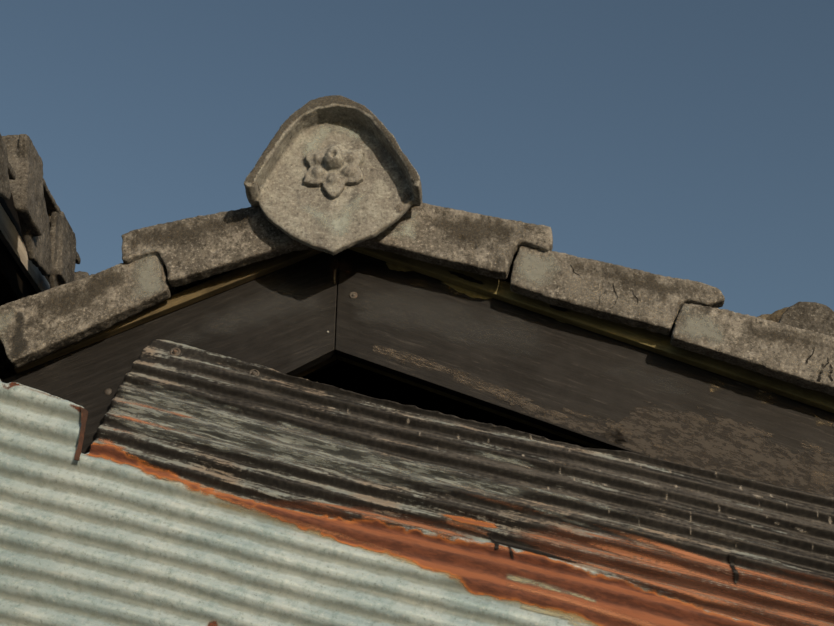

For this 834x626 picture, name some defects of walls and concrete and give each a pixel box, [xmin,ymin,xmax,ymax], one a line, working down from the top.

crack [805,347,833,382]
rust [86,440,834,626]